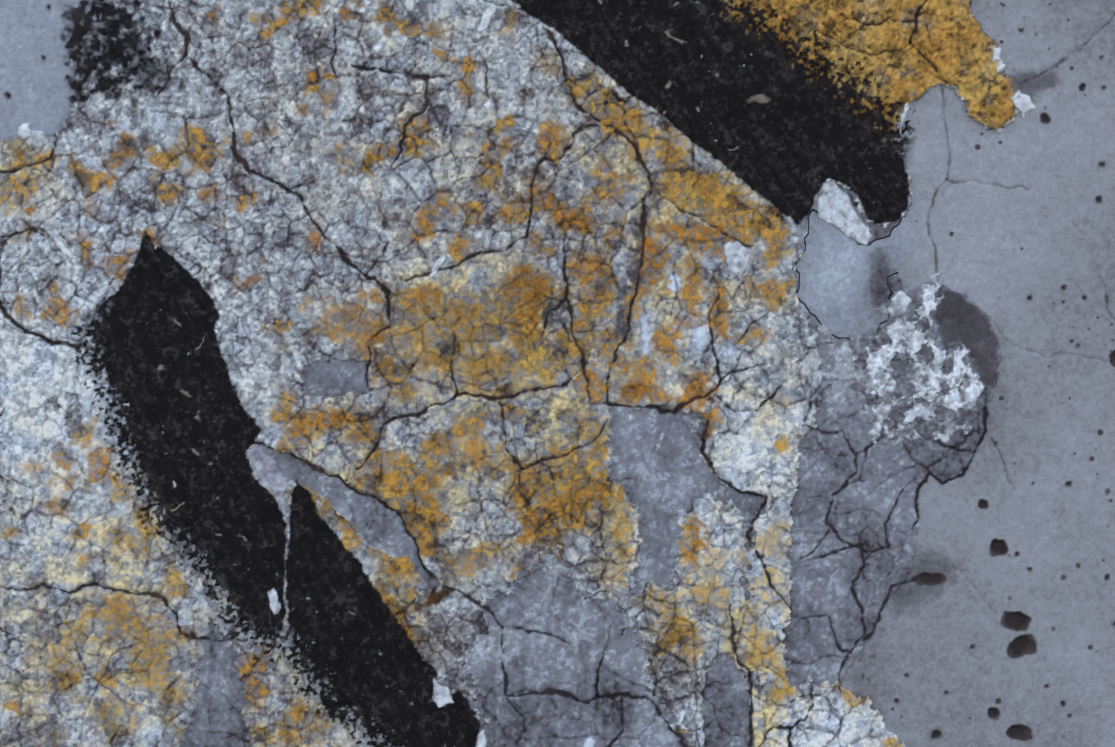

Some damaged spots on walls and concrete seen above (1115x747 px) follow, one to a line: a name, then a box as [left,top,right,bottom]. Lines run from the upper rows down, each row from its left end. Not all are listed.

peeling [477,2,497,32]
peeling [0,0,98,142]
peeling [1011,91,1035,118]
crack [0,135,56,173]
crack [1,229,38,238]
peeling [818,180,873,245]
crack [0,268,94,350]
crack [158,0,988,747]
peeling [783,281,1001,687]
peeling [459,404,767,747]
crack [0,582,248,642]
peeling [432,678,453,707]